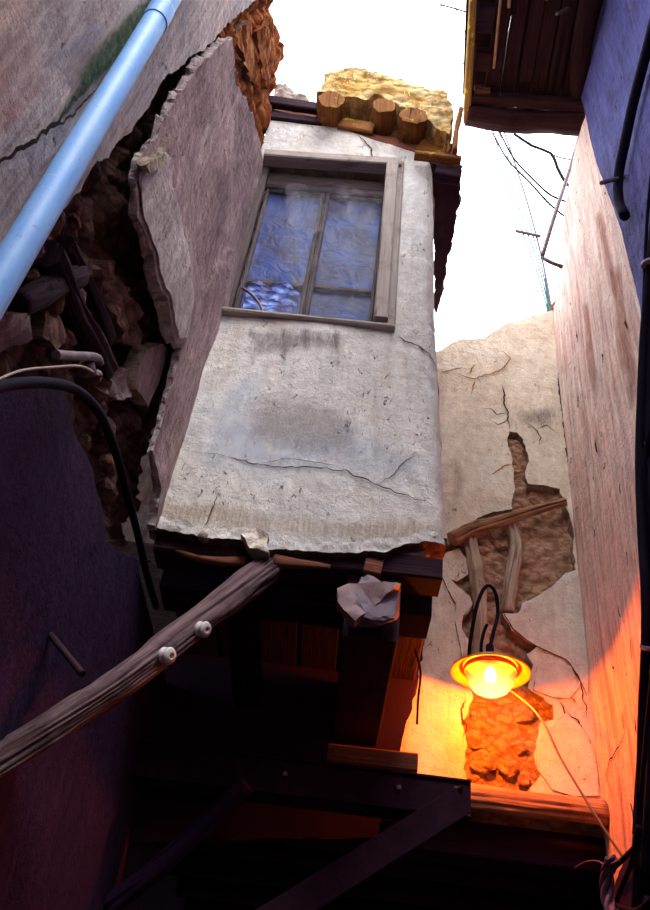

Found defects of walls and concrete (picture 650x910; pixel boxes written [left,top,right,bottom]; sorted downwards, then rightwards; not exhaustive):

water stain [81,0,150,88]
crack [0,73,99,164]
flaking render [0,0,285,552]
crack [397,334,568,462]
crack [199,451,436,509]
flaking render [147,438,599,797]